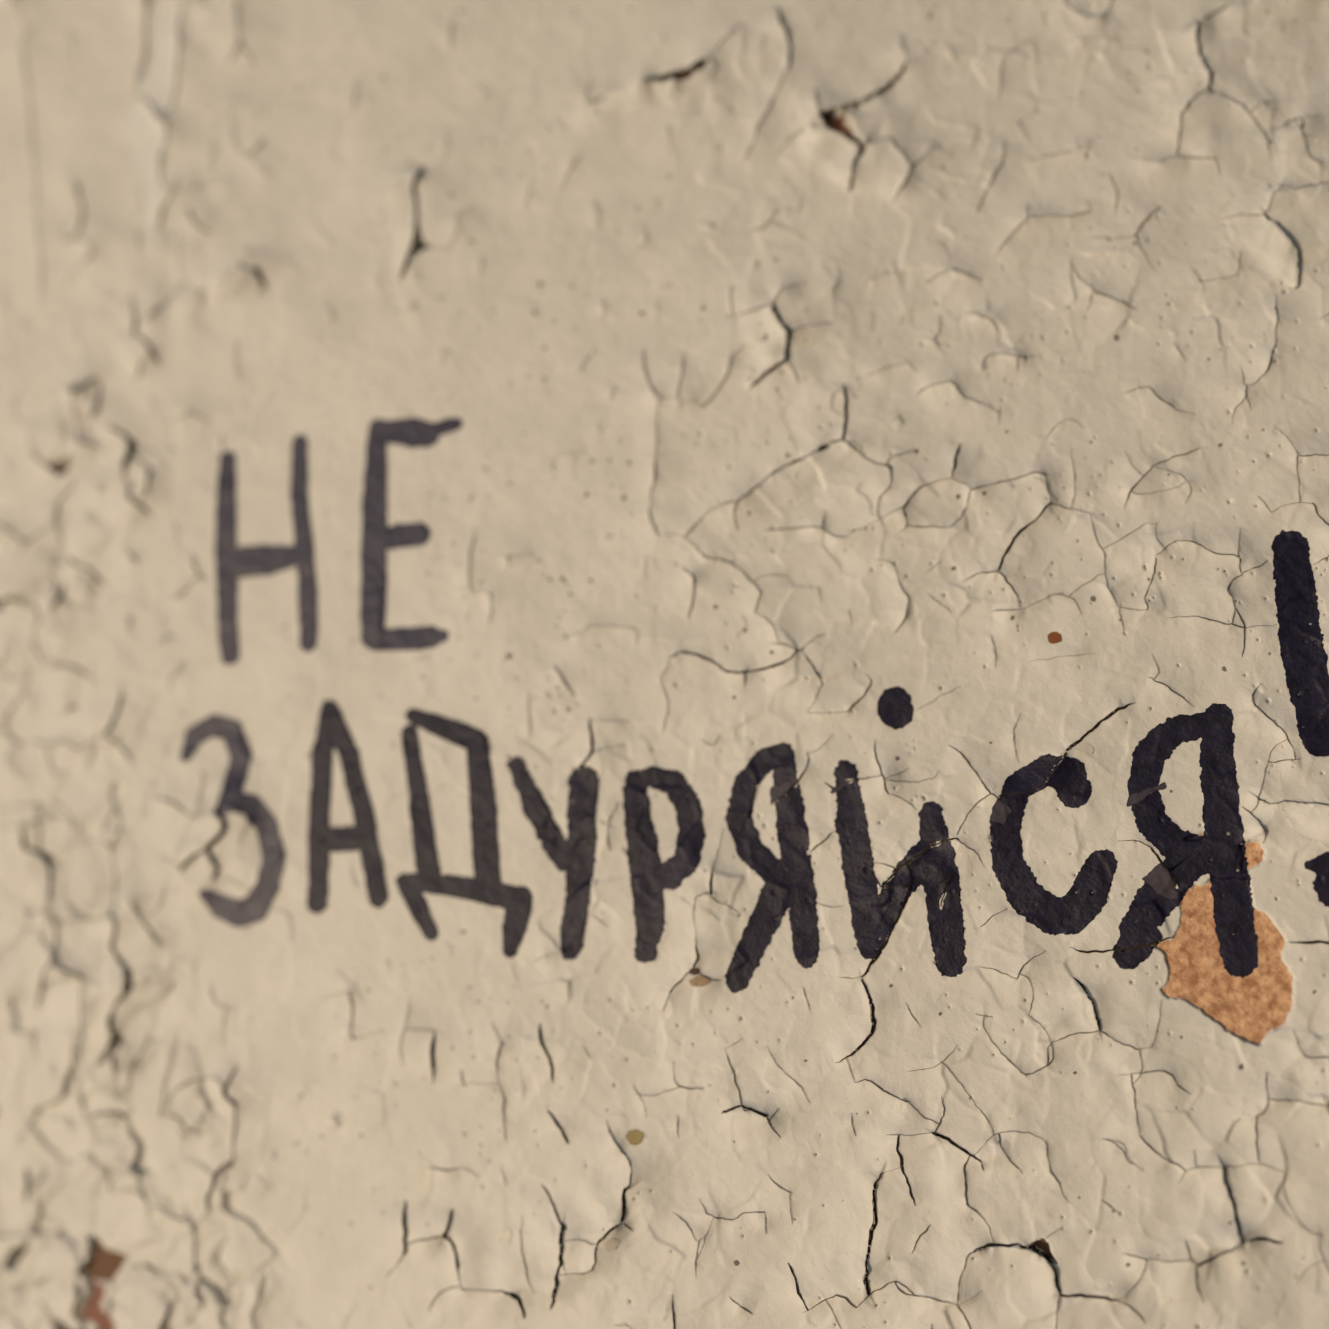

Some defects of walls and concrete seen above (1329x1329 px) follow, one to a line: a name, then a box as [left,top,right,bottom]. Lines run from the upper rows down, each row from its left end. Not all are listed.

peeling [590,62,724,118]
crack [645,25,738,95]
crack [792,32,909,136]
peeling [788,78,919,191]
crack [147,773,248,893]
peeling [1244,842,1264,870]
peeling [1155,881,1293,1044]
crack [164,983,268,1238]
crack [349,991,507,1186]
crack [538,1025,568,1144]
crack [386,1121,633,1319]
peeling [110,1263,173,1329]